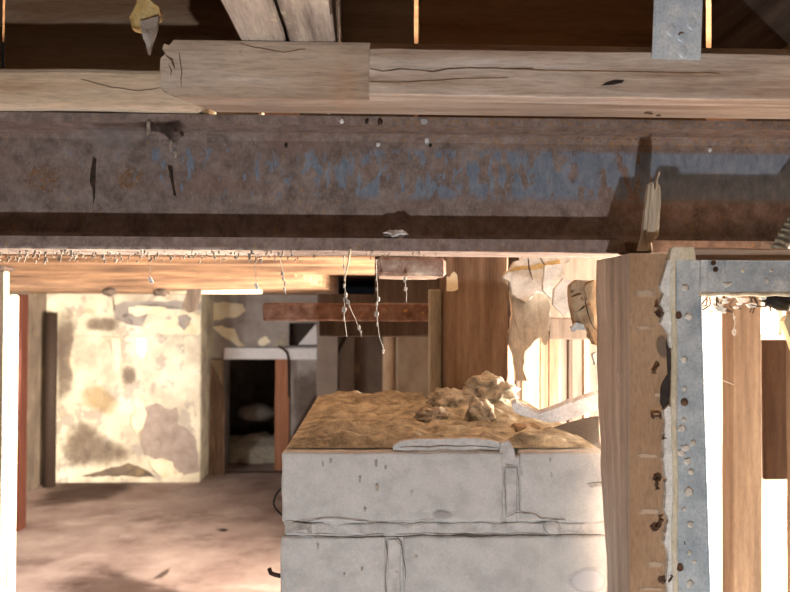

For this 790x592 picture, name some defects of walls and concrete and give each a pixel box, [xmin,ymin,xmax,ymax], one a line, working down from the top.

spalling [114,300,201,359]
peeling [213,302,246,347]
leakage [69,424,124,464]
spalling [82,394,200,478]
crack [288,449,602,592]